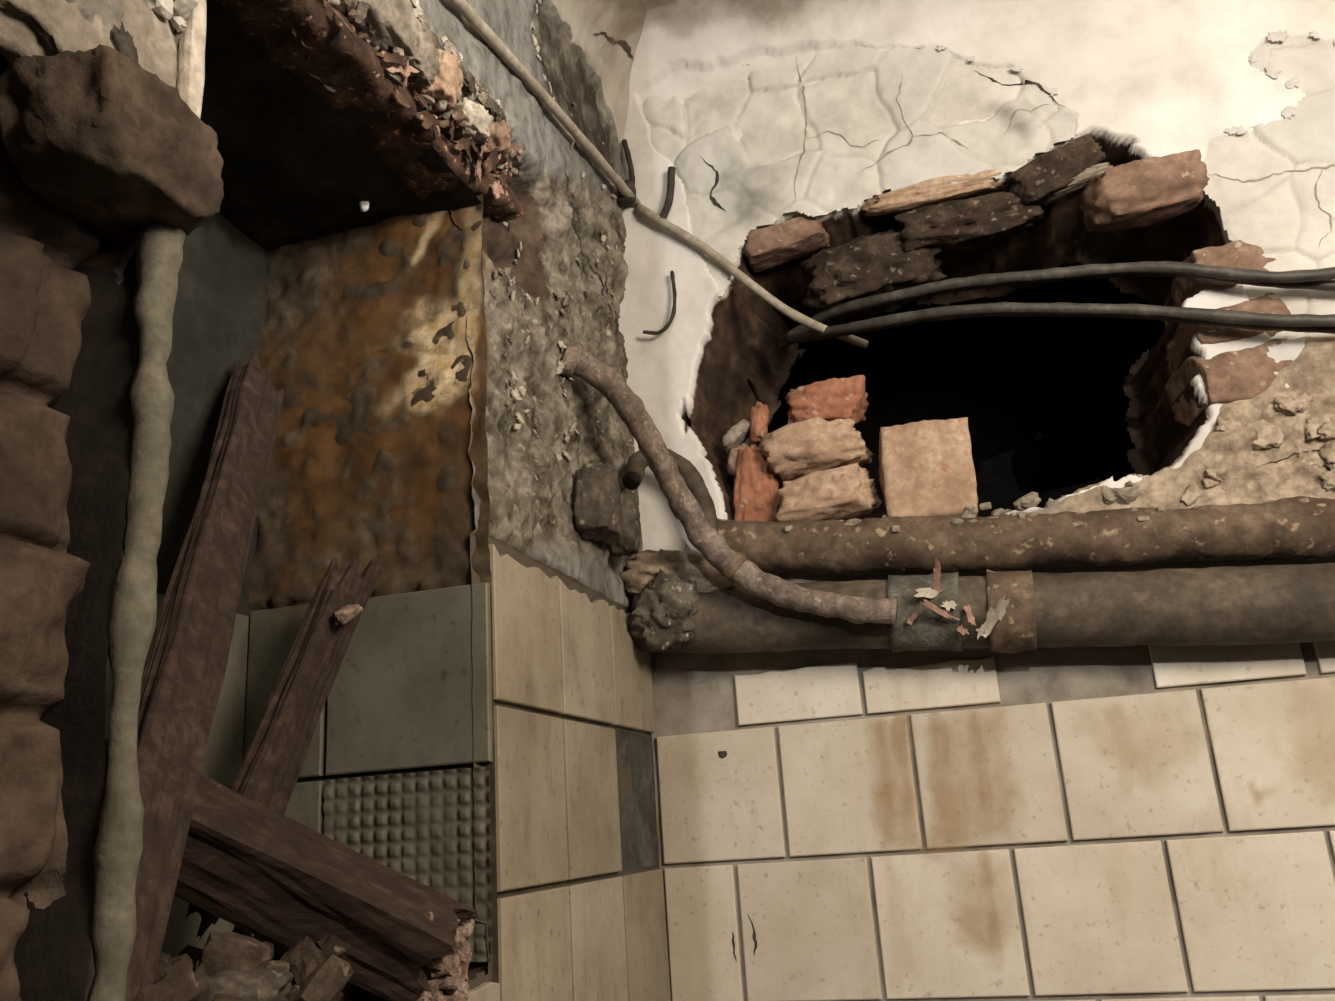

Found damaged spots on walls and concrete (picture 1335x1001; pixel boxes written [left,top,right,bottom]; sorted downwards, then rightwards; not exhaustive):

peeling [410,0,506,122]
crack [703,159,726,212]
peeling [643,44,1079,296]
crack [794,59,966,203]
crack [977,71,1065,132]
crack [1210,164,1335,246]